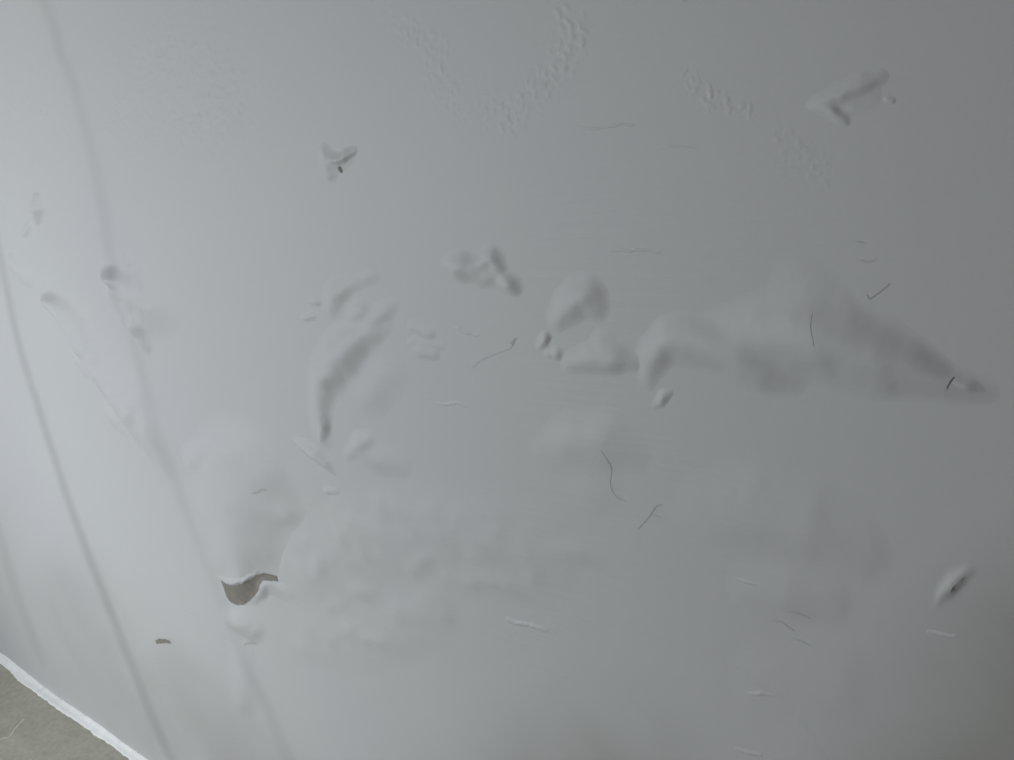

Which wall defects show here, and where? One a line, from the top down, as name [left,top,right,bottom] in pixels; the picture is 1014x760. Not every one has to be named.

peeling [181,409,340,606]